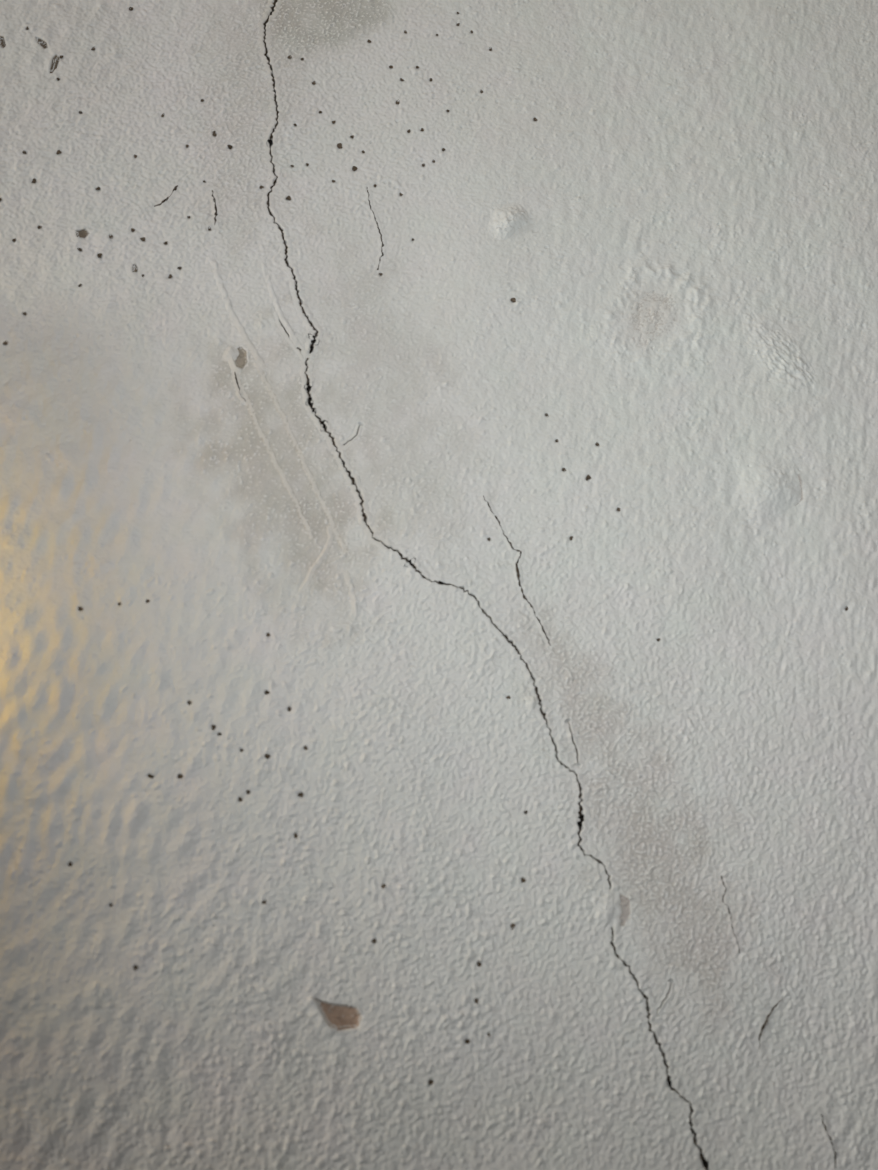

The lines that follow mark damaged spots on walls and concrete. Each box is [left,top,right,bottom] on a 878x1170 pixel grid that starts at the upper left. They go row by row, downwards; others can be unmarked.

peeling [303,995,361,1041]
crack [257,0,716,1170]